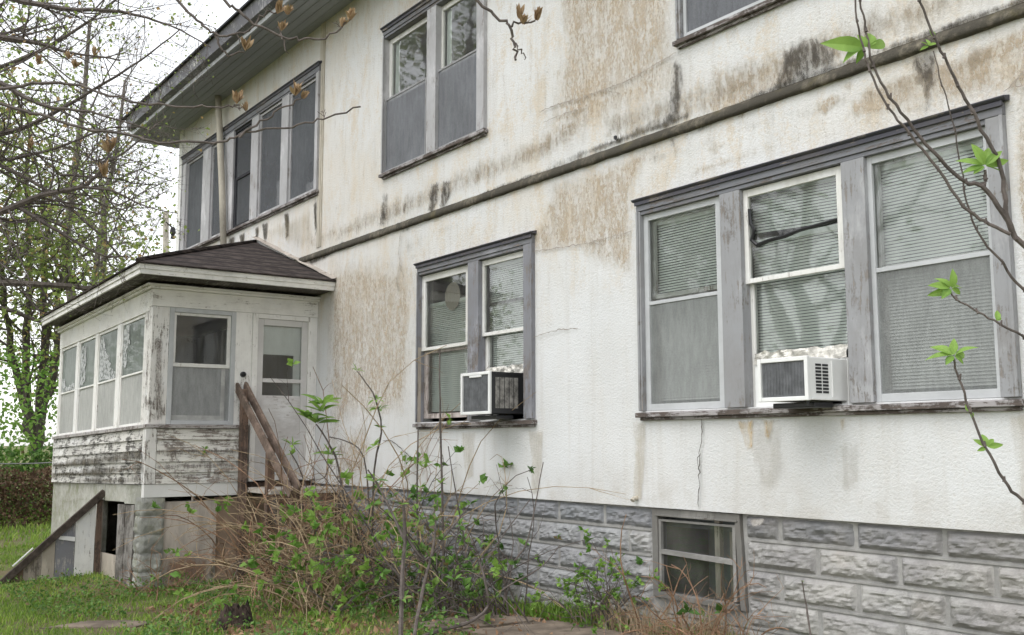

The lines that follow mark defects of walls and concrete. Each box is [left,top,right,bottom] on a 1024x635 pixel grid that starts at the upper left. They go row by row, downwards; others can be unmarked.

water stain [877,0,1024,52]
water stain [751,40,863,99]
water stain [913,56,934,93]
water stain [382,183,456,220]
peeling [158,449,234,468]
crack [696,419,704,501]